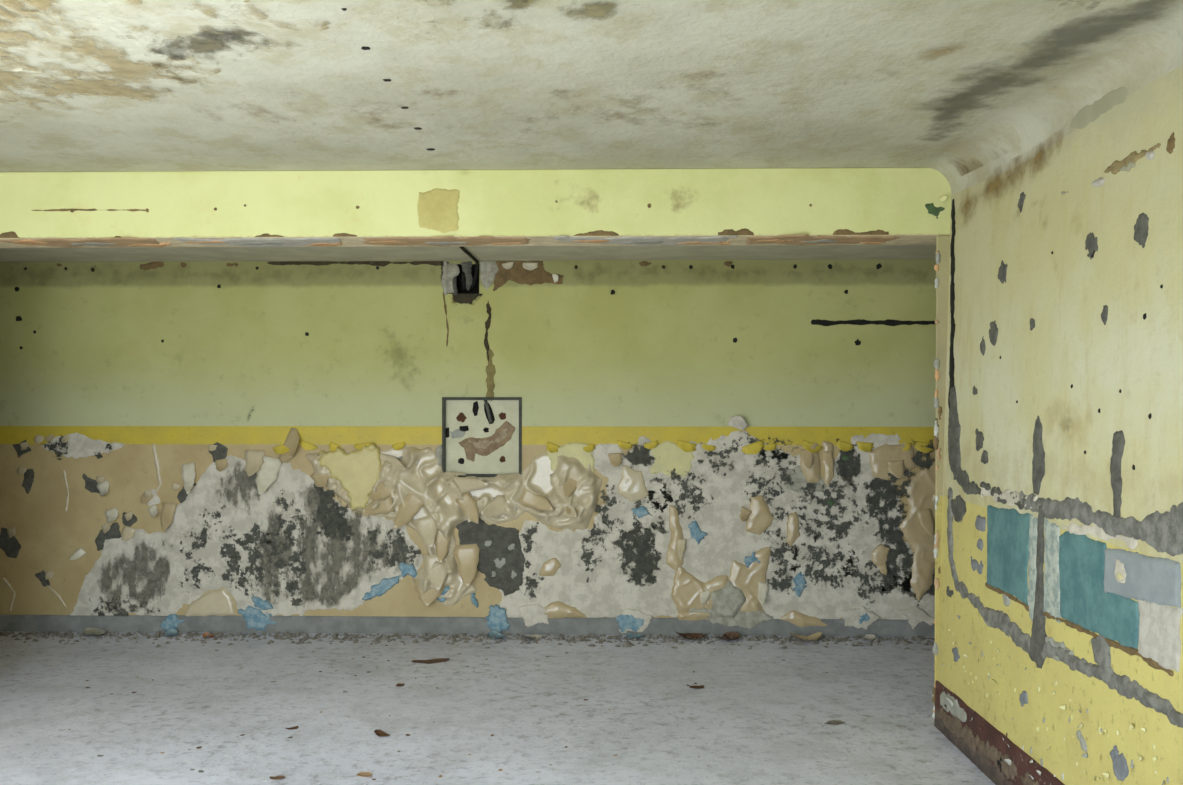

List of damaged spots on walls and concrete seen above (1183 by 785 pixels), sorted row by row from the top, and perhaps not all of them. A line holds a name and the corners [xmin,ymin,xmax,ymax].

damp [0,0,269,110]
crack [140,261,187,270]
crack [268,261,449,347]
crack [484,300,496,401]
peeling [441,261,564,295]
peeling [45,428,423,631]
peeling [499,358,1183,697]
spalling [932,684,1064,785]
spalling [1014,680,1169,785]